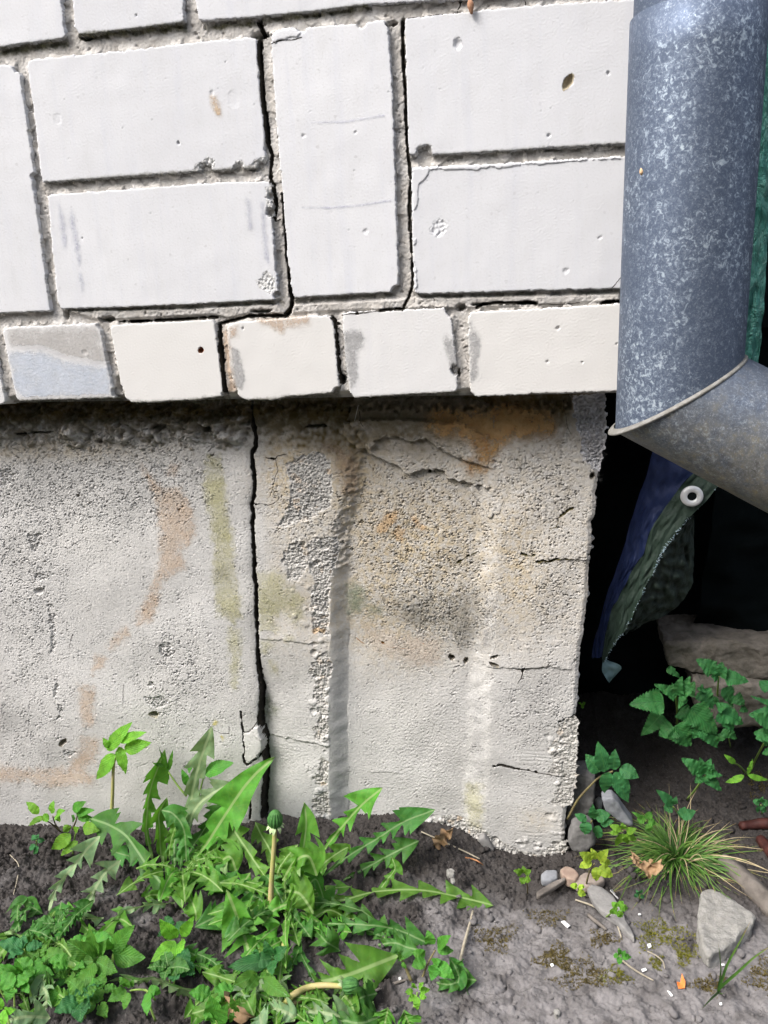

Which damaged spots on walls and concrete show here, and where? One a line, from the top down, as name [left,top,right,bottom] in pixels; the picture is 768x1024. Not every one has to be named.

crack [330,2,462,384]
crack [119,20,302,819]
corrosion [427,403,555,472]
spalling [277,451,341,637]
spalling [308,651,335,743]
spalling [311,757,331,817]
crack [494,764,569,778]